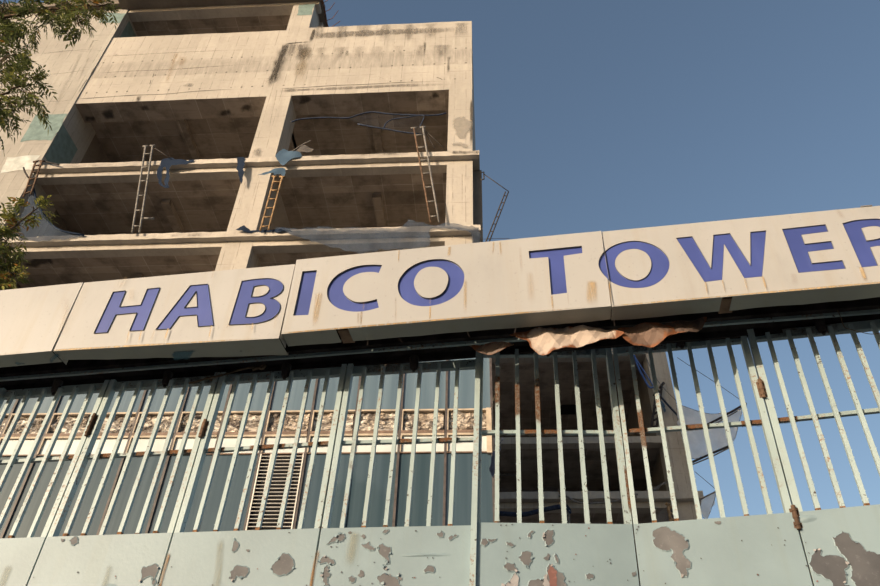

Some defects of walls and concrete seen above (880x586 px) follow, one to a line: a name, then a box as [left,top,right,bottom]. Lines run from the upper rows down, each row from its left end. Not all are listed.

leakage [270,29,439,83]
peeling [271,552,295,576]
peeling [317,529,440,586]
peeling [480,524,570,586]
peeling [652,526,702,578]
peeling [805,531,880,586]